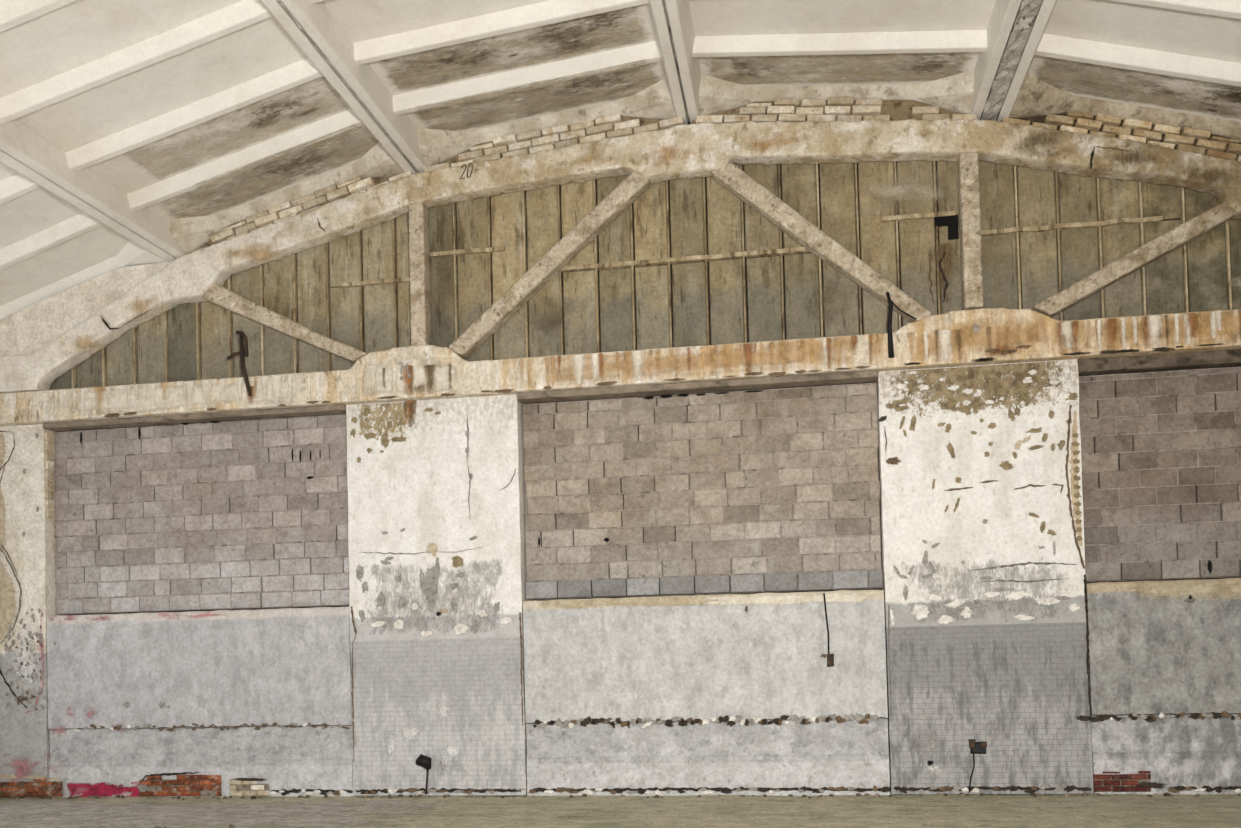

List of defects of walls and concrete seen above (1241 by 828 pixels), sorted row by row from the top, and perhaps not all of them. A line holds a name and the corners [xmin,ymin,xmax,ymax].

water stain [385,8,644,89]
water stain [418,60,657,131]
water stain [712,53,967,84]
water stain [1038,62,1241,118]
water stain [172,127,377,218]
corrosion [984,345,1031,355]
peeling [350,393,454,463]
corrosion [404,365,424,420]
peeling [878,343,1223,569]
flaking render [0,431,56,714]
peeling [356,543,513,635]
peeling [894,540,1081,624]